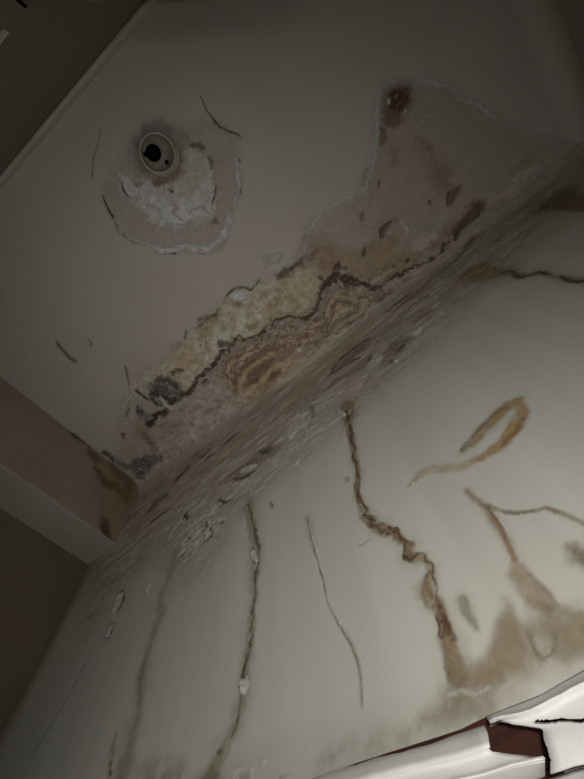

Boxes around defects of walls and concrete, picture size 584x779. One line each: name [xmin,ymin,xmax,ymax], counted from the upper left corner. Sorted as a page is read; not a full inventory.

damp [460,263,584,283]
flaking render [89,80,580,601]
damp [410,397,528,485]
damp [443,490,584,714]
crack [535,716,584,724]